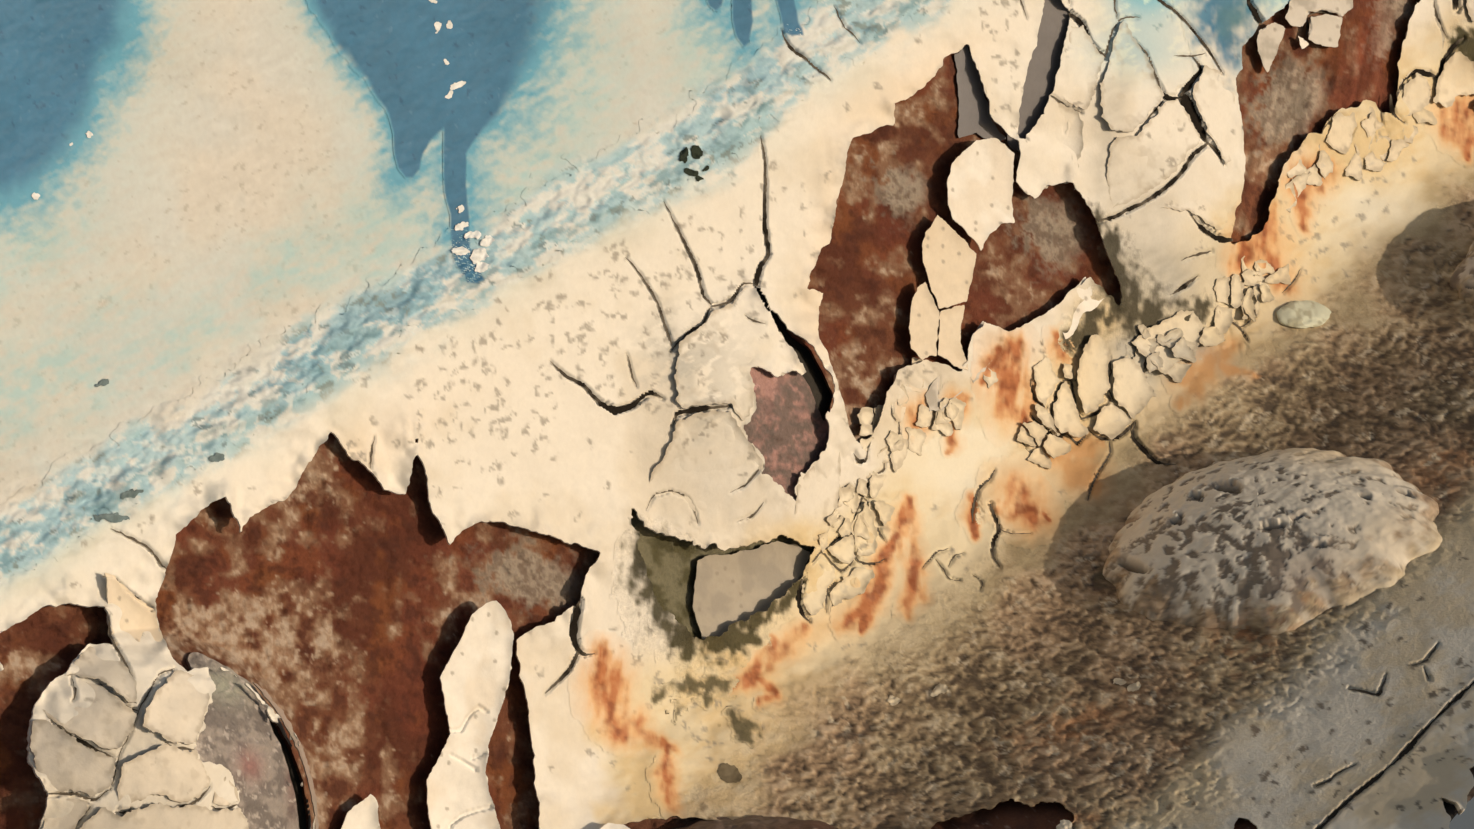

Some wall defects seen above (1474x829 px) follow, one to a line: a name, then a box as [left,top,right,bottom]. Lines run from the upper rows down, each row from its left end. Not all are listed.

crack [1069,0,1224,222]
peeling [0,433,599,829]
corrosion [568,629,688,819]
crack [552,353,731,425]
peeling [600,816,698,829]
crack [625,136,770,351]
corrosion [727,489,937,712]
crack [797,405,900,622]
peeling [931,799,1074,829]
corrosion [894,319,1121,550]
peeling [631,0,1474,640]
crack [1023,361,1176,499]